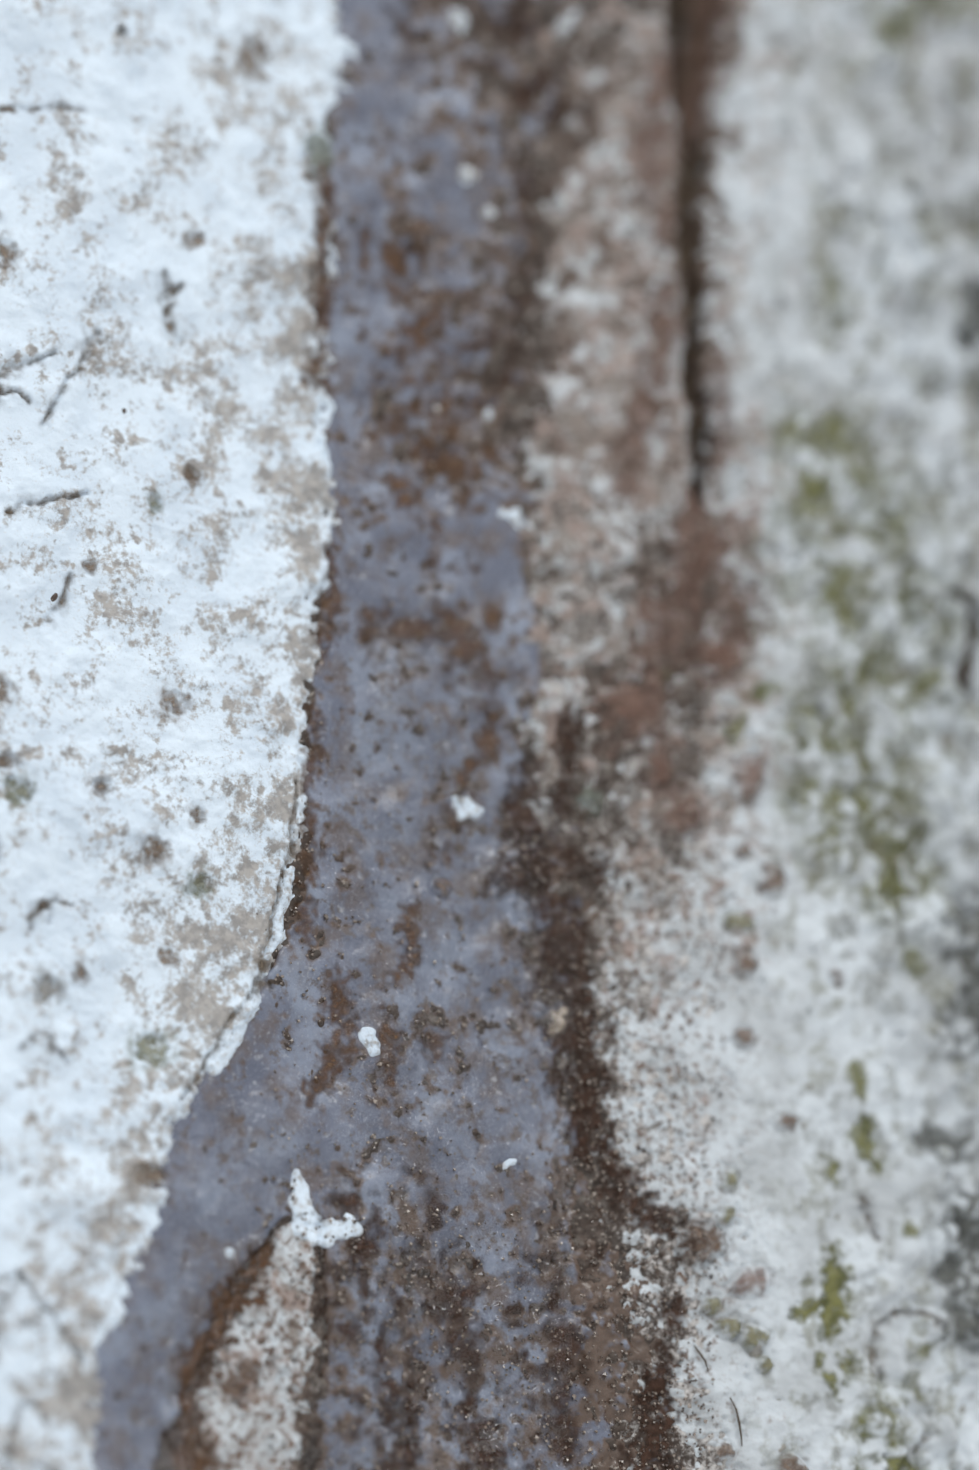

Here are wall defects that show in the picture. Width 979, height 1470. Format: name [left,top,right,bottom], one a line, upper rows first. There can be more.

rust [511,55,590,126]
water stain [726,683,783,746]
crack [189,781,297,1088]
rust [482,705,696,1247]
rust [408,1169,446,1227]
rust [314,1192,424,1470]
rust [429,1261,507,1470]
rust [521,1252,588,1465]
rust [619,1296,684,1470]